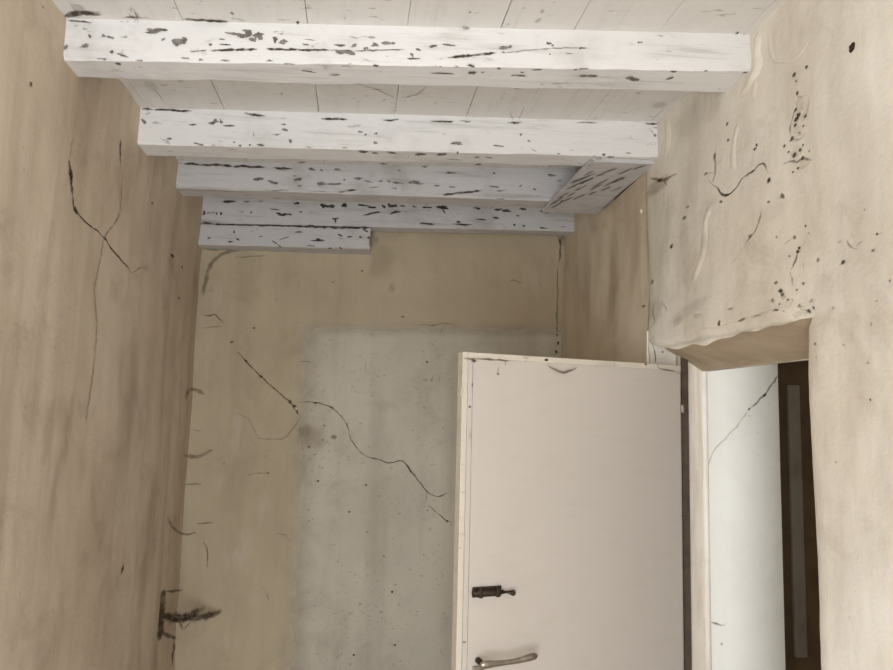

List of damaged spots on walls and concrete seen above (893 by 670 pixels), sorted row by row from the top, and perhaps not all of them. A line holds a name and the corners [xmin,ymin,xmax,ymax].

peeling [146,28,187,46]
peeling [209,29,288,46]
peeling [334,41,396,55]
peeling [539,153,646,214]
crack [705,163,770,197]
crack [68,160,129,269]
peeling [358,203,449,215]
peeling [456,207,527,227]
crack [230,341,448,522]